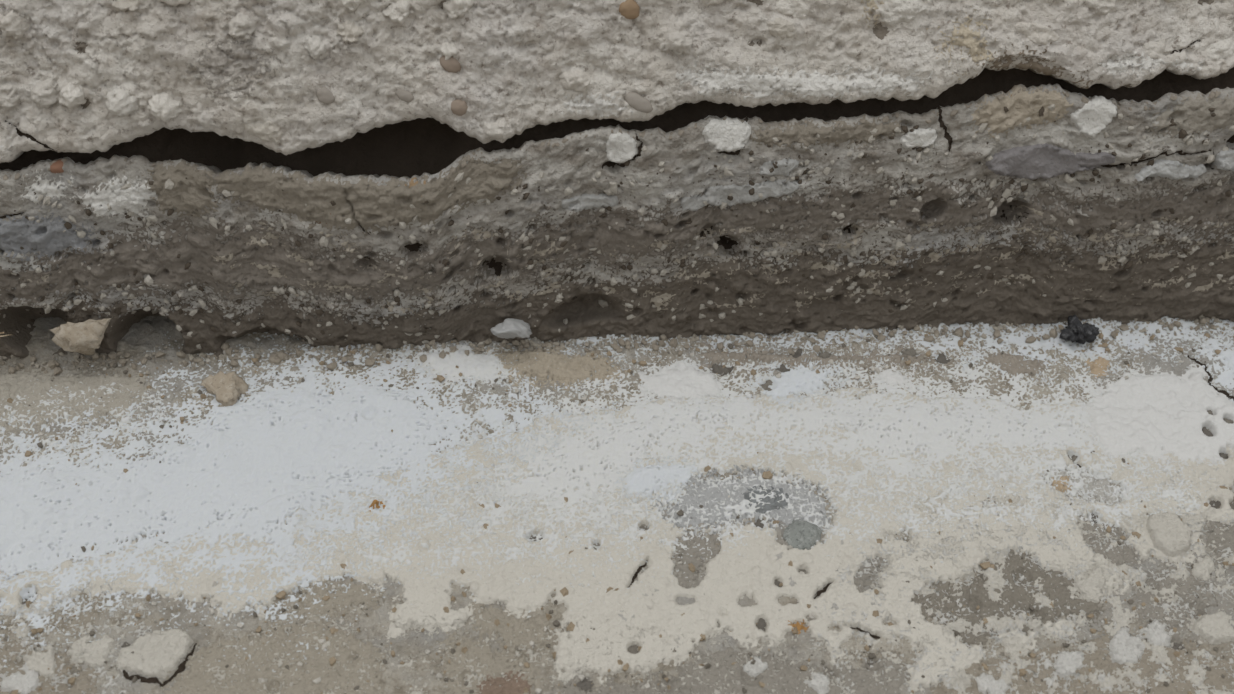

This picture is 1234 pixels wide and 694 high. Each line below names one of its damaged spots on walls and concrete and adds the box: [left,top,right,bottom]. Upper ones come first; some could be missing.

crack [0,40,1234,178]
water stain [0,152,1234,676]